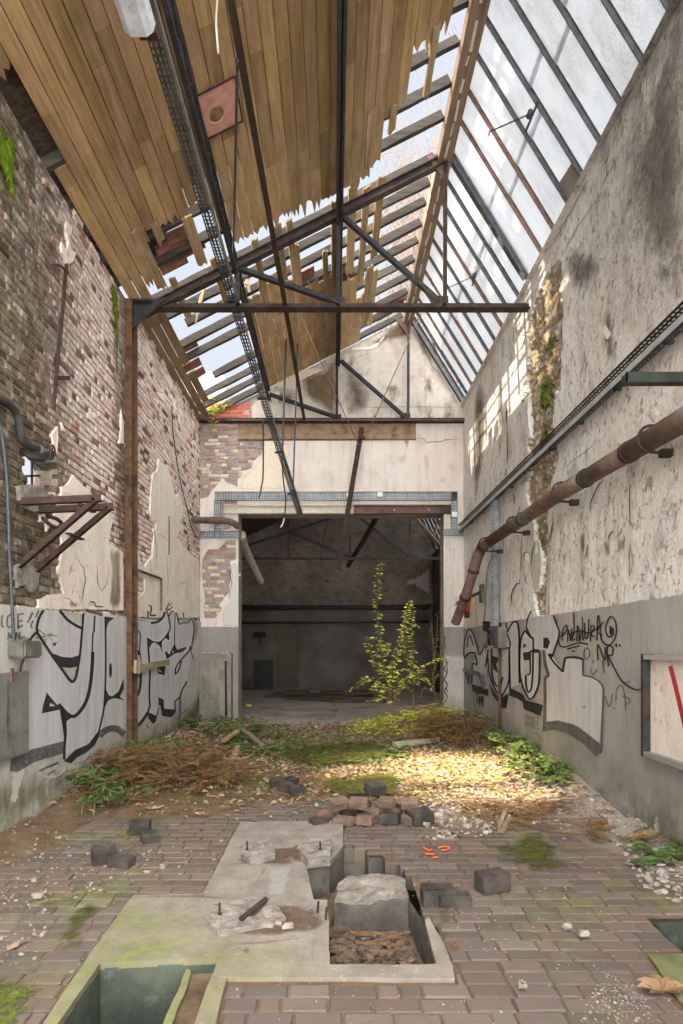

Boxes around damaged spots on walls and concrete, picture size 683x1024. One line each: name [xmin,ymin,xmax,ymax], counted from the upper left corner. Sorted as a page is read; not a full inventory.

flaking render [16,422,124,618]
flaking render [138,459,241,626]
flaking render [200,404,289,496]
flaking render [531,511,551,616]
flaking render [527,263,564,505]